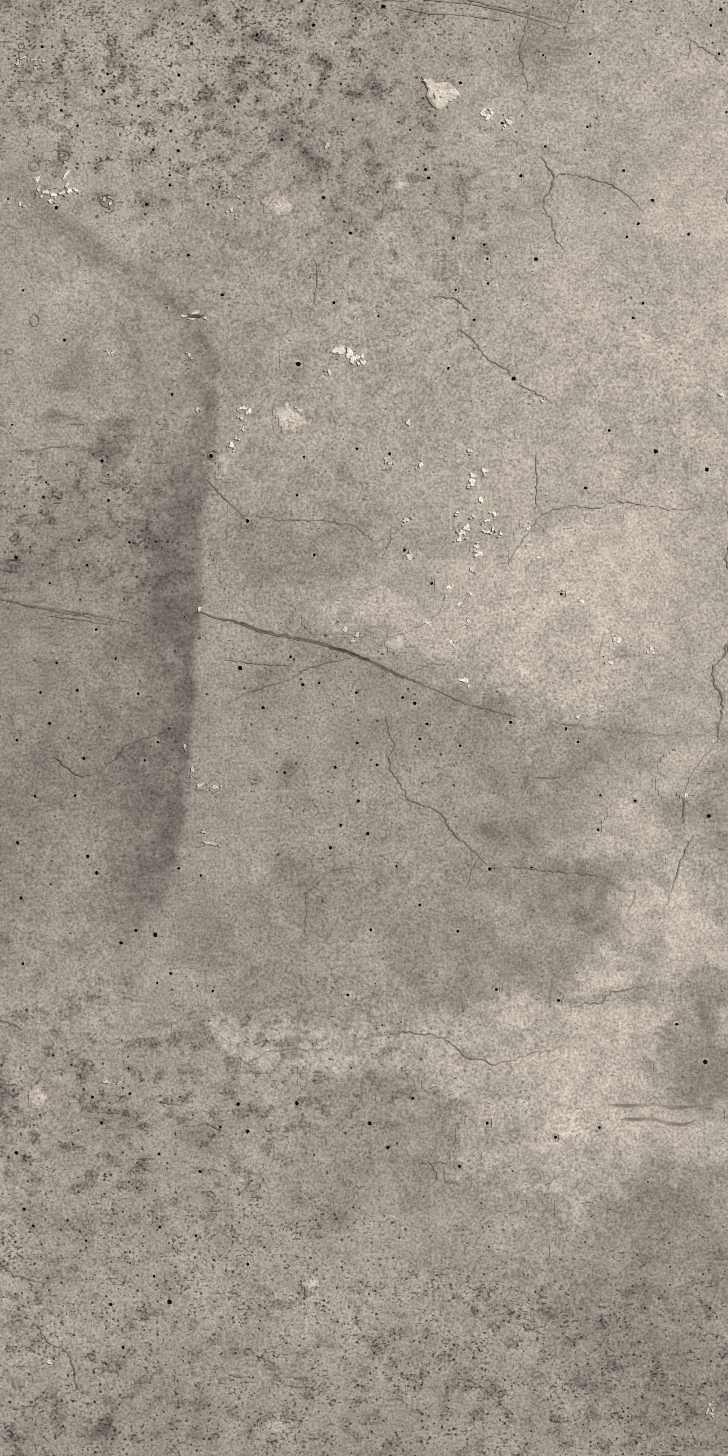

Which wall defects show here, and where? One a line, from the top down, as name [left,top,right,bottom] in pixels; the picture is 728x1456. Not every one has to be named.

peeling [421,76,460,110]
water stain [261,190,296,219]
water stain [352,145,569,301]
water stain [273,401,311,433]
water stain [0,161,236,953]
crack [207,480,392,560]
crack [495,455,704,567]
water stain [211,498,728,806]
crack [200,586,728,915]
water stain [172,787,728,1456]